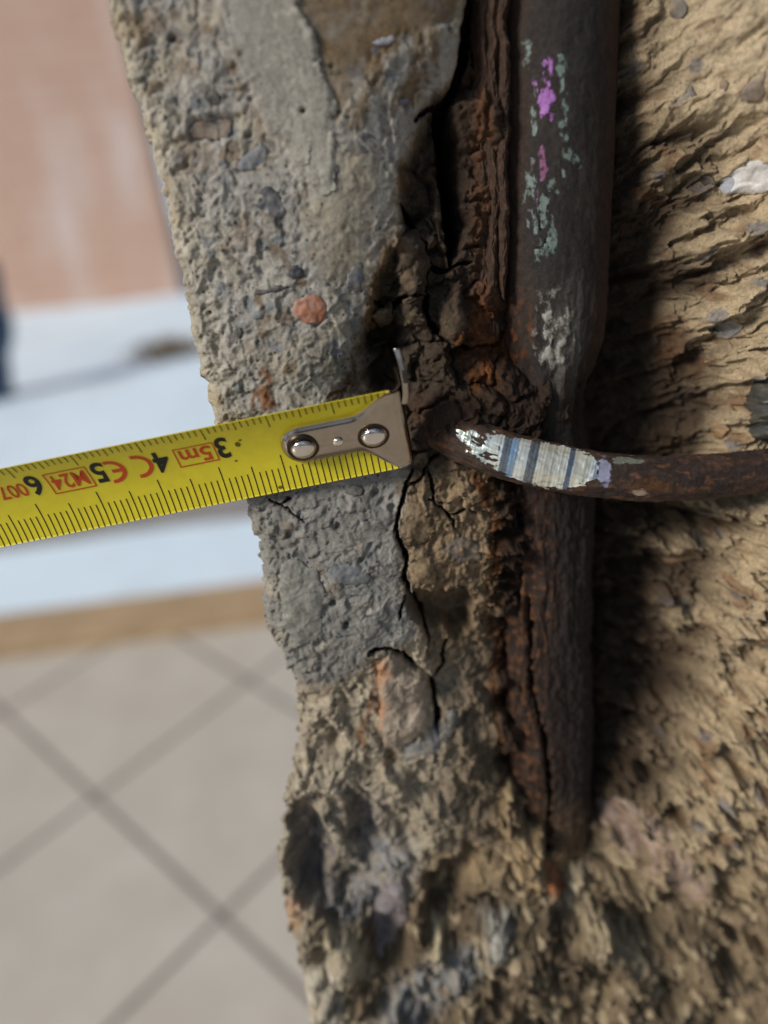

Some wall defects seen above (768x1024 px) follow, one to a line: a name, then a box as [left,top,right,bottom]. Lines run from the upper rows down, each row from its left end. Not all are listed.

crack [368,453,476,725]
spalling [277,0,768,1024]